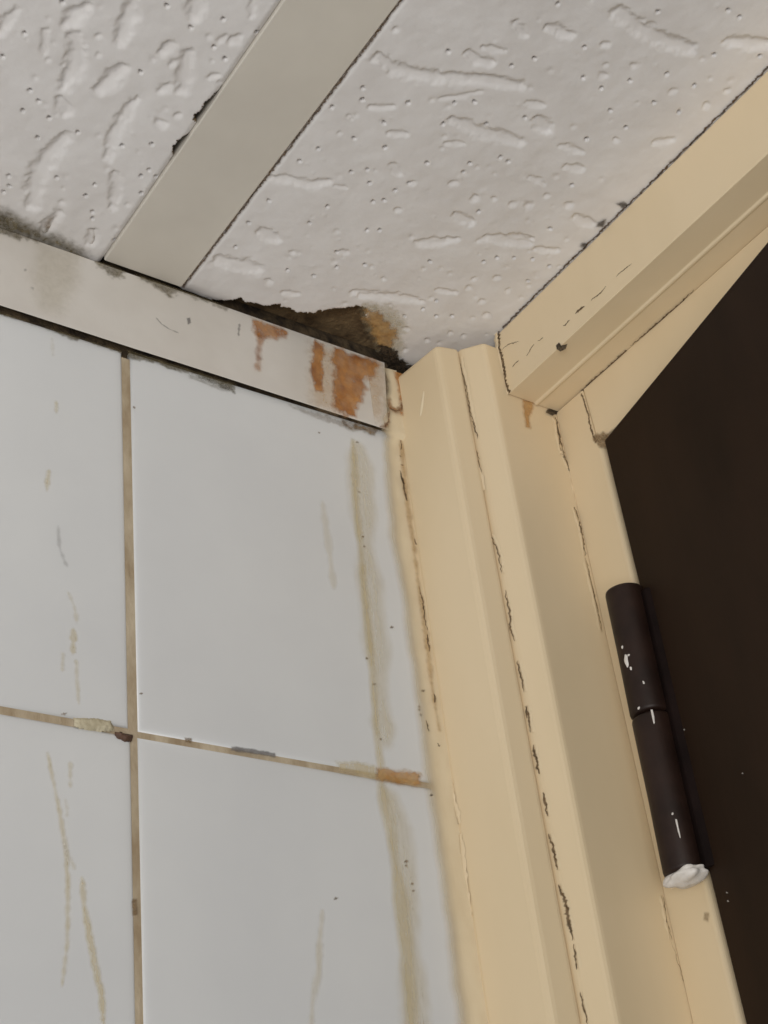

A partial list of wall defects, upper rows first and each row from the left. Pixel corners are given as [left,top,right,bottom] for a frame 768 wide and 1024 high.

mould [0,213,82,257]
rust [253,320,287,338]
spalling [235,297,381,351]
rust [311,341,378,416]
crack [494,331,542,395]
crack [383,402,407,499]
crack [460,356,485,491]
crack [552,416,603,632]
crack [419,588,430,651]
rust [378,769,420,785]
crack [492,534,592,1024]